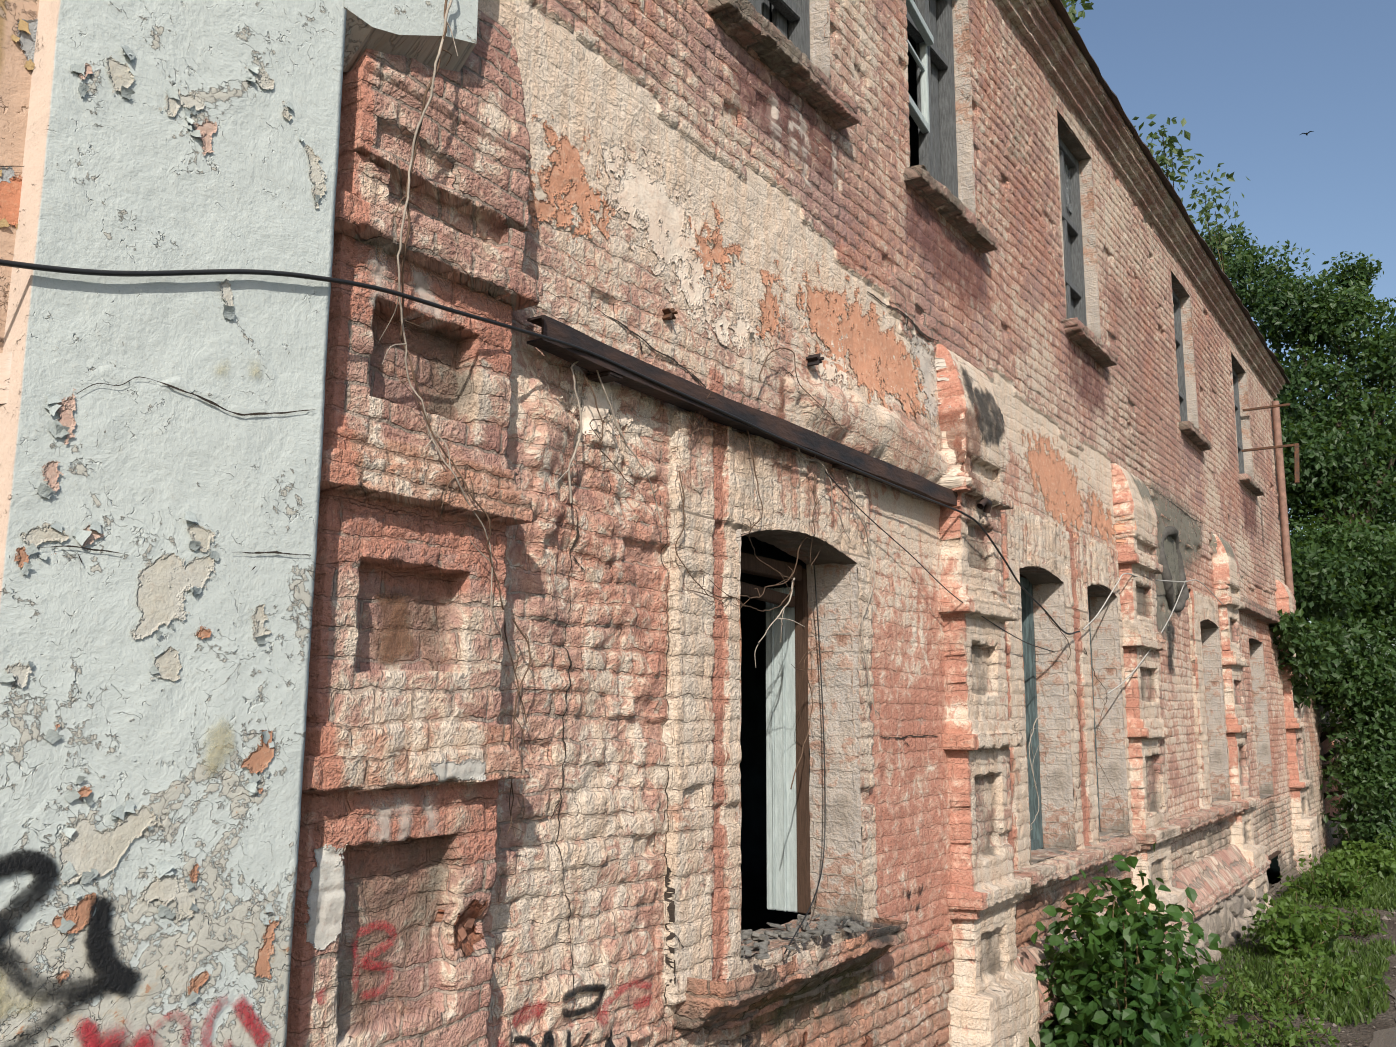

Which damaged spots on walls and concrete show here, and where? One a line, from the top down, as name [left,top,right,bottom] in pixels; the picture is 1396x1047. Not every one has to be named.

peeling [0,167,23,229]
peeling [527,114,968,441]
peeling [44,388,76,445]
crack [77,377,315,416]
peeling [559,359,634,463]
peeling [1022,417,1138,546]
peeling [14,521,104,576]
peeling [130,511,220,682]
peeling [241,730,275,796]
crack [550,487,585,999]
peeling [52,776,164,942]
spalling [434,899,488,958]